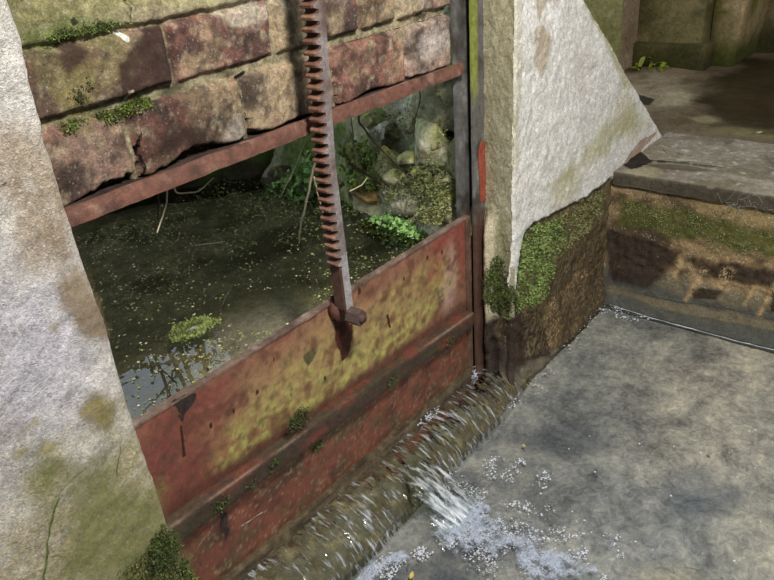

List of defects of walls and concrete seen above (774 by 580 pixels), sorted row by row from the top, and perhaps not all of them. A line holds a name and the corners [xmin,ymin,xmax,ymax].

rust [304,349,316,365]
rust [333,319,353,361]
crack [43,472,80,580]